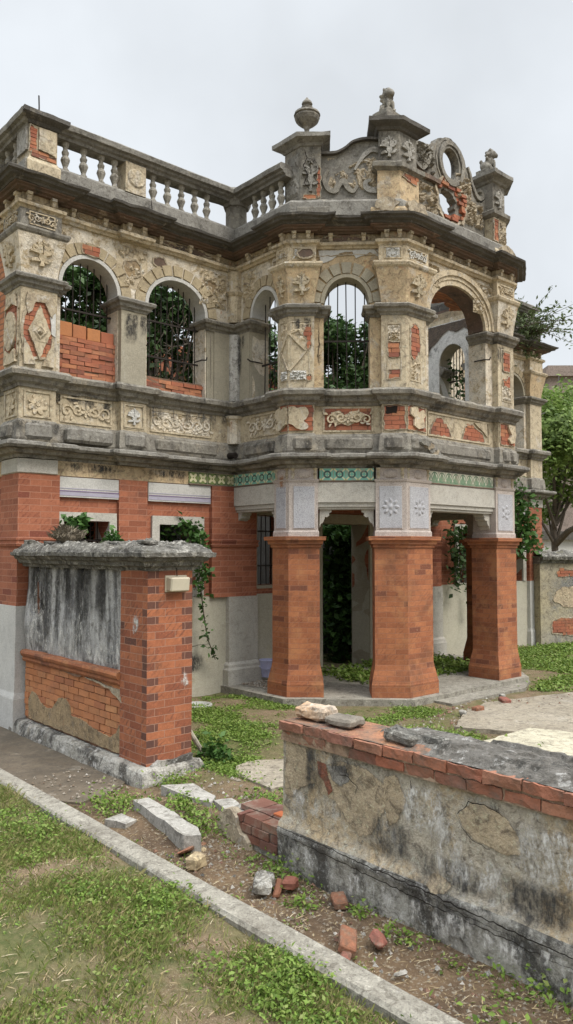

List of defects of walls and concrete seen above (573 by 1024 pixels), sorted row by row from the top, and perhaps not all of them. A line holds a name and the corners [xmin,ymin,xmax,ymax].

peeling [28,123,57,165]
spalling [375,175,470,225]
peeling [280,404,485,443]
damp [27,567,119,665]
peeling [551,568,573,636]
damp [293,751,319,816]
peeling [284,741,406,837]
crack [456,801,503,850]
crack [277,826,573,970]
damp [349,788,573,964]